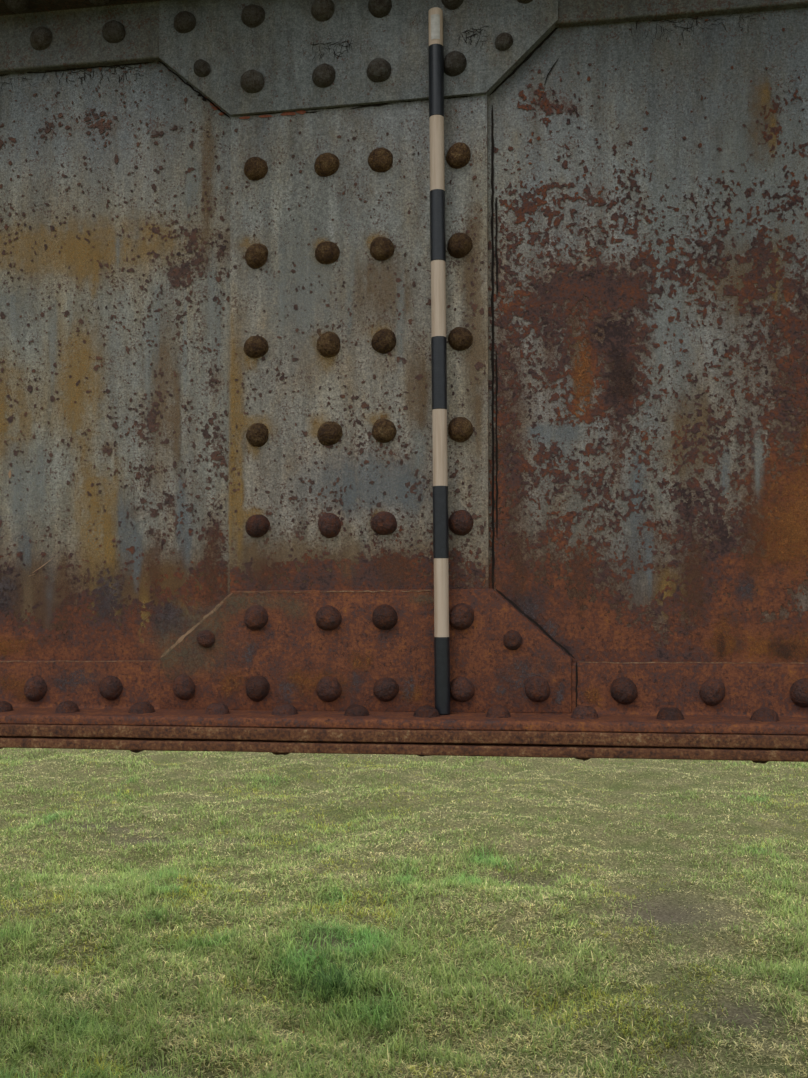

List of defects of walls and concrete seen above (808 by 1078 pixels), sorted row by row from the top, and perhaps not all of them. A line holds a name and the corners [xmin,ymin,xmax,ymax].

corrosion [490,238,663,443]
corrosion [716,226,808,428]
corrosion [155,500,434,648]
corrosion [448,548,486,589]